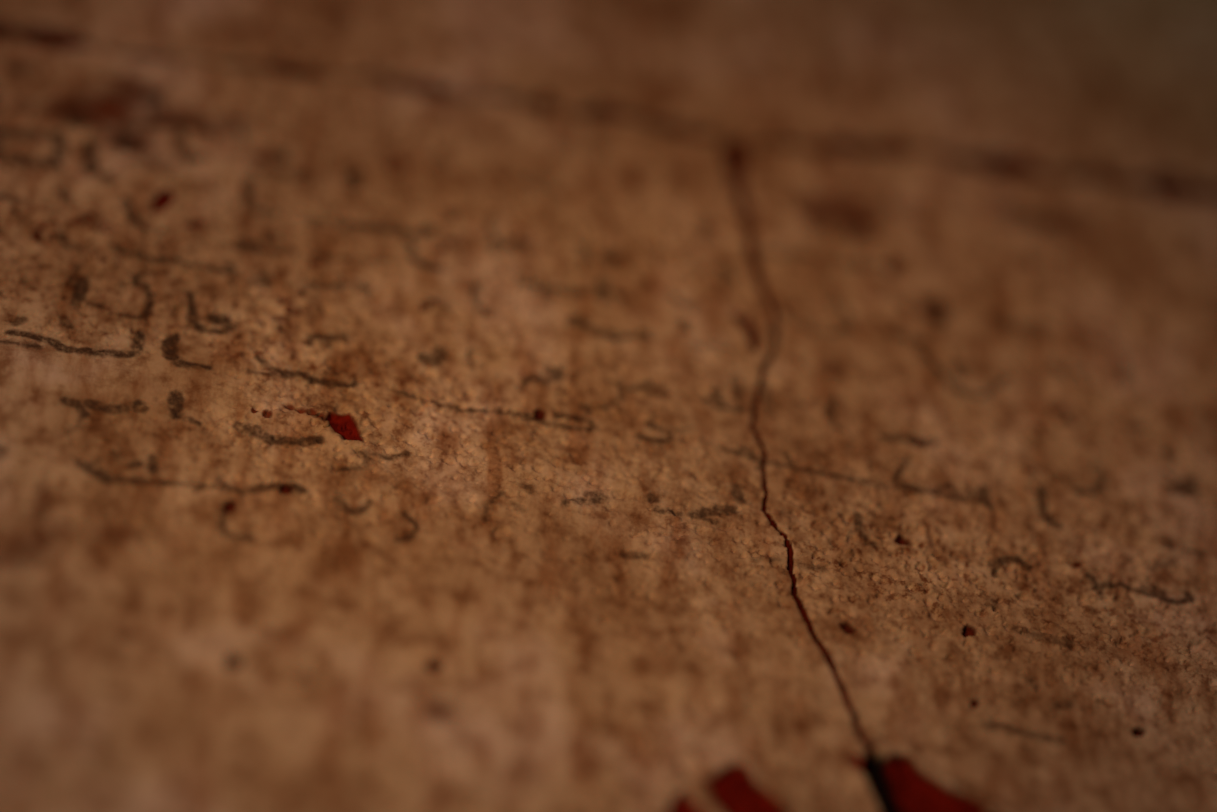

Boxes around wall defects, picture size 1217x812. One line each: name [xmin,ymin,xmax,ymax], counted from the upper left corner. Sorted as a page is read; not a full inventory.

crack [721,140,900,812]